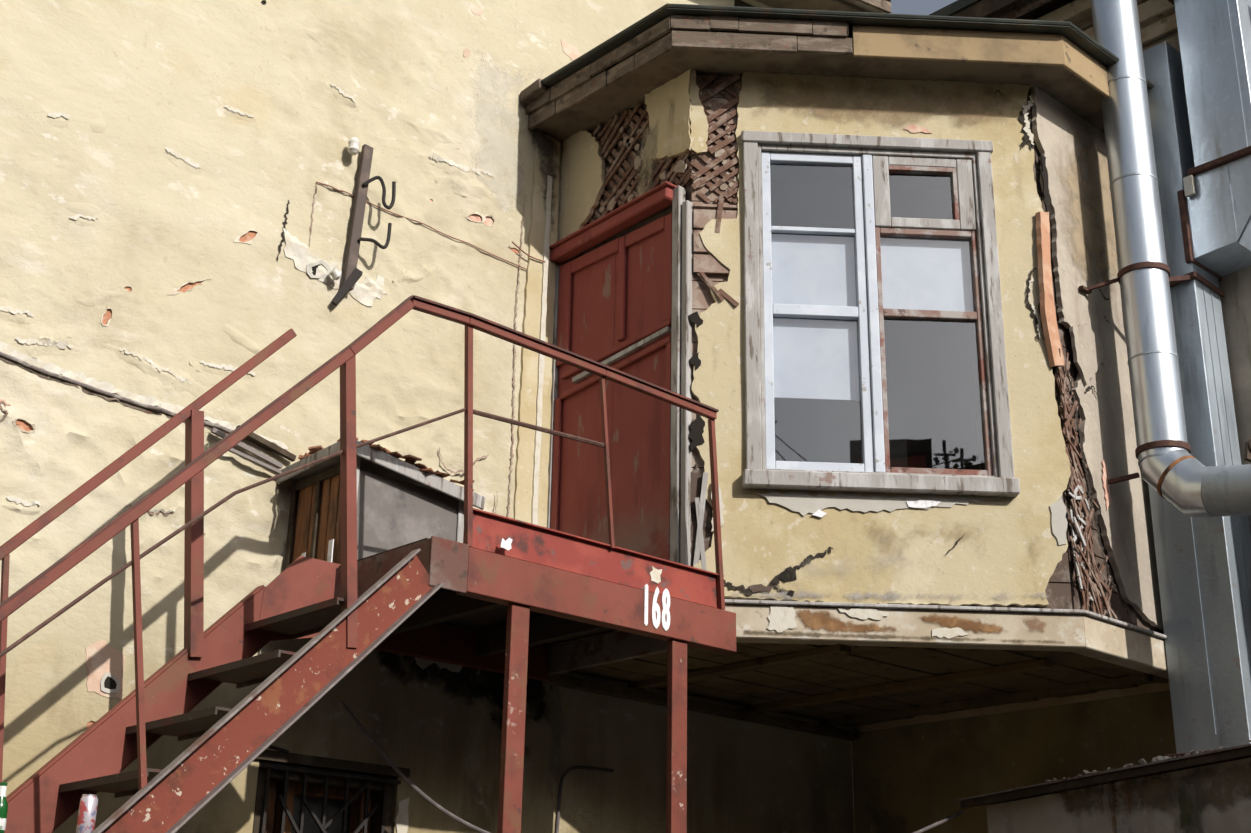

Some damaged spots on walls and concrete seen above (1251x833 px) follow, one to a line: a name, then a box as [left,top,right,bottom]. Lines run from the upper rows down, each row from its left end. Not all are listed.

crack [276,183,351,261]
spalling [282,228,388,307]
spalling [693,197,739,307]
flaking render [1035,211,1107,385]
crack [0,399,11,421]
flaking render [755,491,1001,518]
peeling [1102,460,1112,511]
crack [724,547,833,595]
peeling [922,614,1003,639]
spalling [100,672,121,693]
leakage [488,678,504,740]
leakage [1060,763,1251,833]